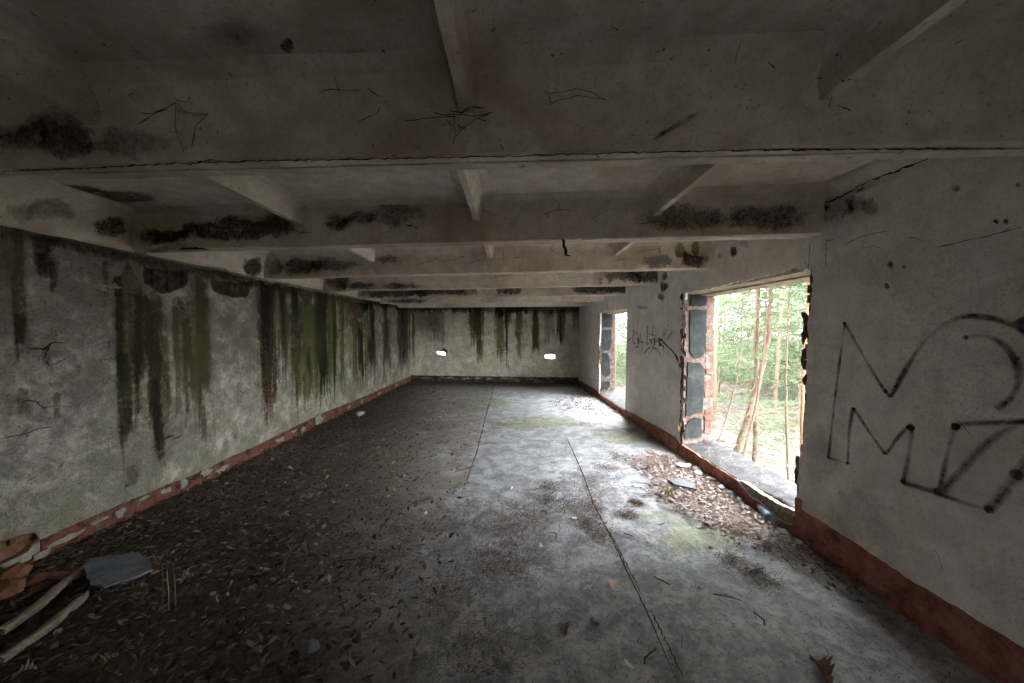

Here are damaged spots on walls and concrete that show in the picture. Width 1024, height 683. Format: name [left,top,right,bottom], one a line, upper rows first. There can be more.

water stain [0,119,92,171]
water stain [325,204,419,230]
crack [3,148,1019,271]
water stain [648,205,807,231]
water stain [675,241,736,268]
water stain [0,212,579,458]
flaking render [801,312,809,385]
peeling [138,479,188,501]
peeling [201,464,229,477]
flaking render [794,444,803,490]